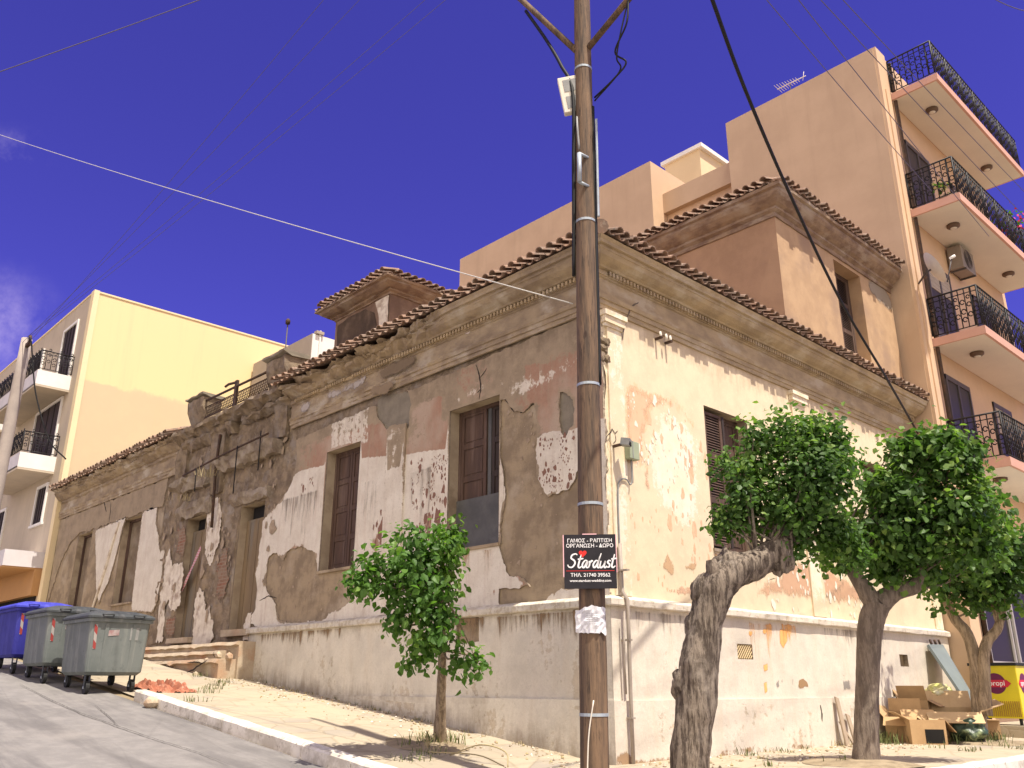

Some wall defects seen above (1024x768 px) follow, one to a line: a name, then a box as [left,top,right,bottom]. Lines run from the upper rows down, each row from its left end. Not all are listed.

spalling [49,414,354,675]
spalling [328,356,415,429]
peeling [410,454,447,540]
spalling [499,392,578,604]
peeling [625,387,711,594]